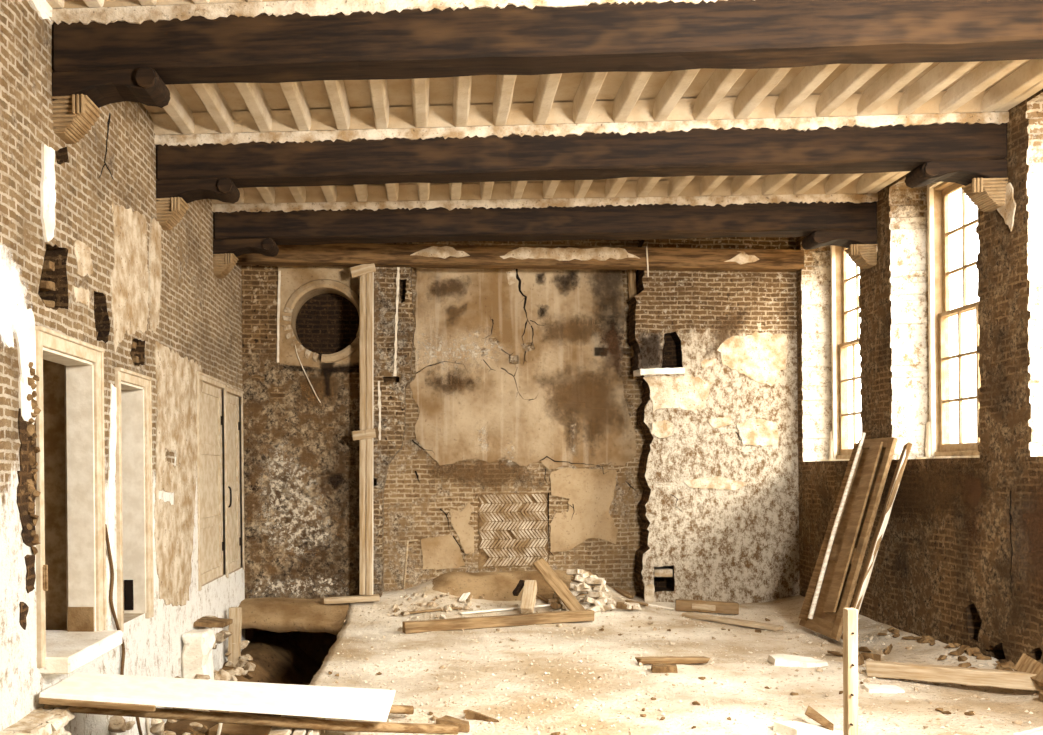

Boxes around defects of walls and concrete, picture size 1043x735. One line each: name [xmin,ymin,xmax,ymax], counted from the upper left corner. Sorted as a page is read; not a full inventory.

crack [416,269,544,400]
flaking render [383,267,636,553]
leakage [544,318,603,342]
leakage [542,369,627,451]
flaking render [643,323,789,447]
flaking render [421,501,474,570]
crack [1007,490,1015,593]
spalling [966,604,1006,660]